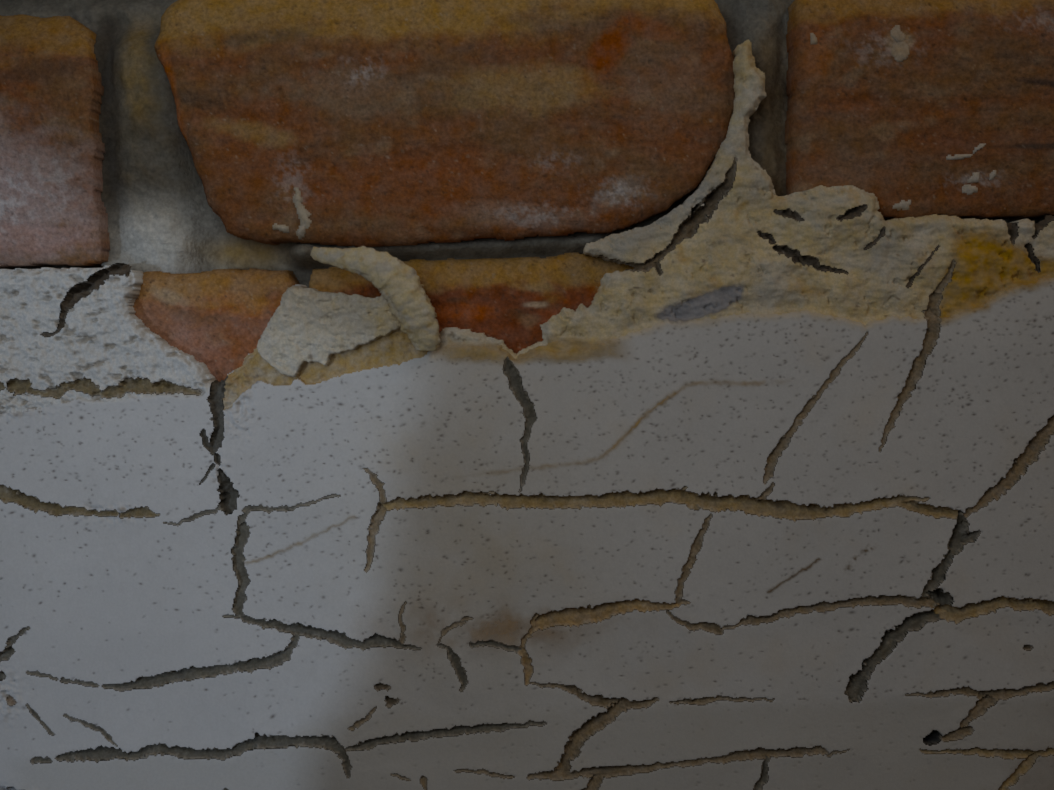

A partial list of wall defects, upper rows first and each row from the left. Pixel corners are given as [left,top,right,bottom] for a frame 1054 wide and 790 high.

peeling [0,40,1054,414]
crack [757,208,849,275]
crack [836,204,886,250]
crack [1007,215,1054,273]
crack [40,263,132,337]
crack [879,245,957,453]
crack [0,332,1054,790]